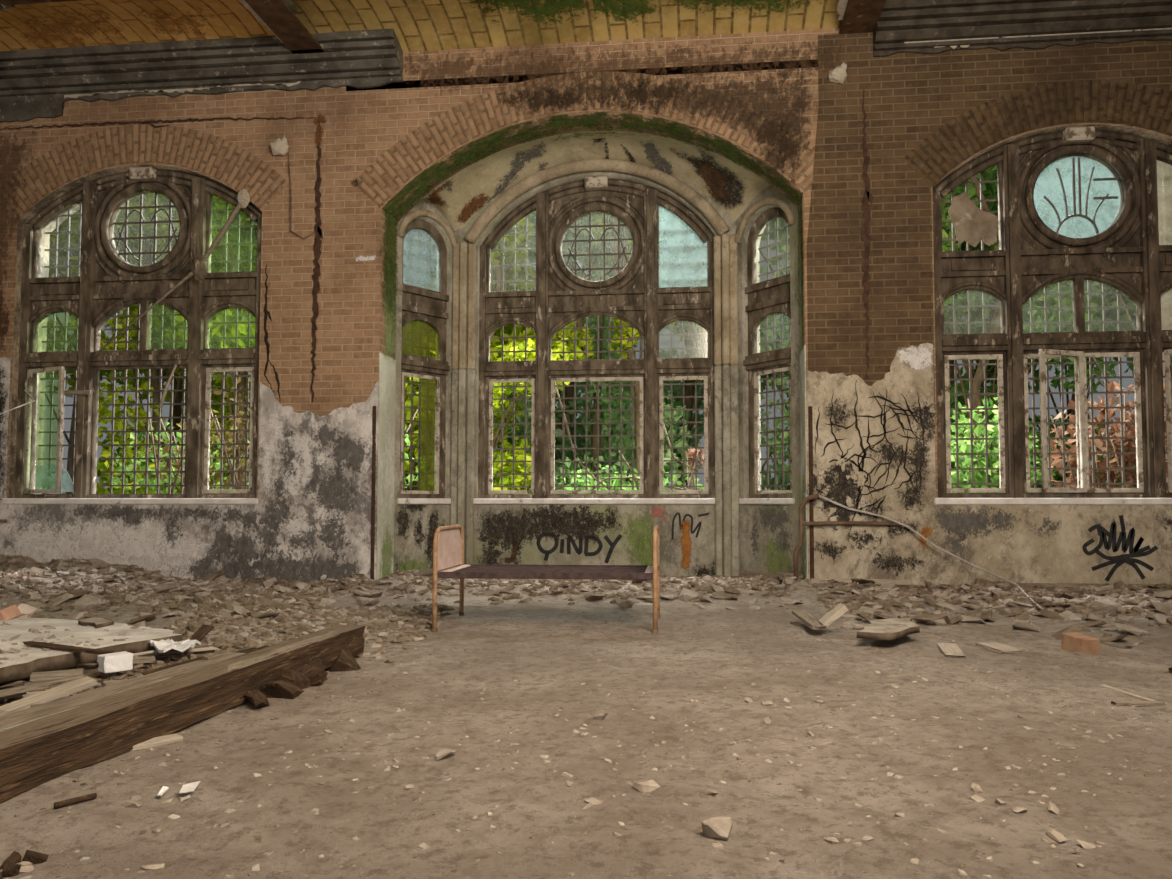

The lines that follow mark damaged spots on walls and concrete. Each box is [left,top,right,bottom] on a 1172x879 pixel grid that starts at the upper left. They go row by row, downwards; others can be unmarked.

peeling [427,180,454,206]
peeling [457,142,548,223]
spalling [641,141,746,209]
leakage [758,114,800,177]
crack [263,264,280,399]
leakage [260,409,344,538]
leakage [360,435,372,473]
leakage [7,504,264,579]